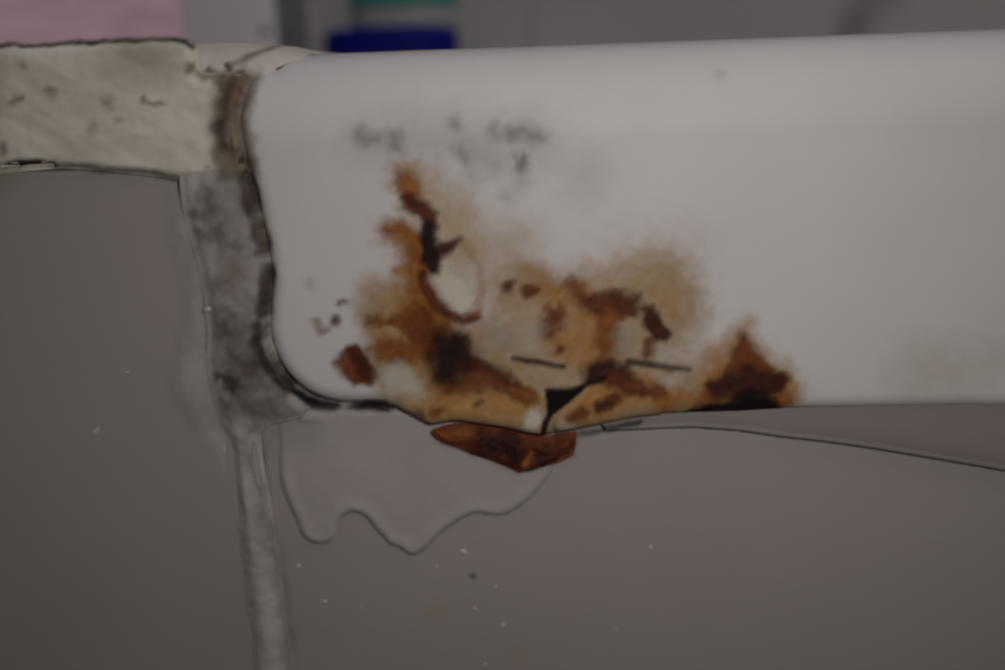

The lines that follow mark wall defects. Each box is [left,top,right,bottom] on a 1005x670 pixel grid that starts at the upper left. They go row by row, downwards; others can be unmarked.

mould [204,63,297,392]
corrosion [334,170,799,473]